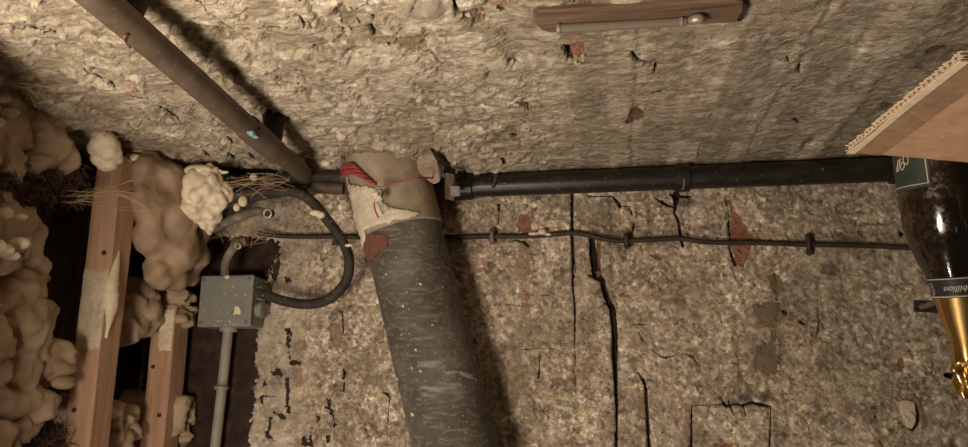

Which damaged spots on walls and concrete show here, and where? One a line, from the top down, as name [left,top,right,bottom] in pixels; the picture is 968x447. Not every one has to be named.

flaking render [560,33,585,66]
flaking render [727,199,754,267]
crack [498,192,771,447]